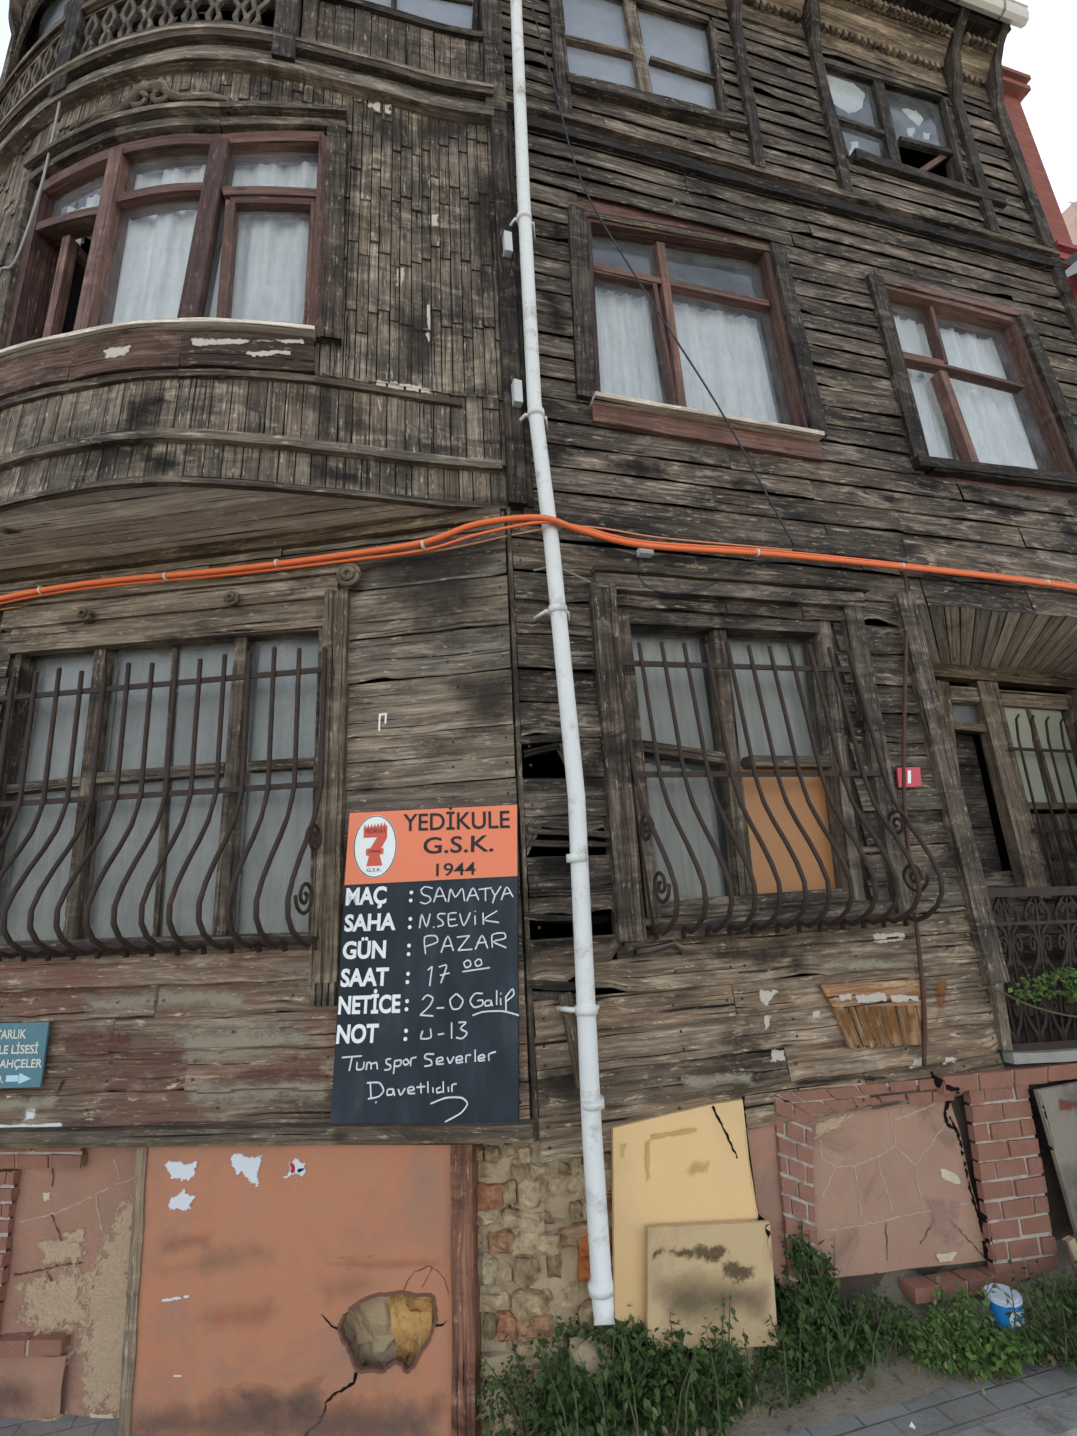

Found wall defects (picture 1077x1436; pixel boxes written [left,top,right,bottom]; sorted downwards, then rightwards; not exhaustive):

peeling [103,345,131,359]
peeling [191,338,304,357]
peeling [839,992,919,1004]
crack [712,1096,771,1253]
crack [930,1071,996,1263]
spalling [15,1195,133,1419]
spalling [337,1290,438,1374]
crack [304,1372,358,1436]